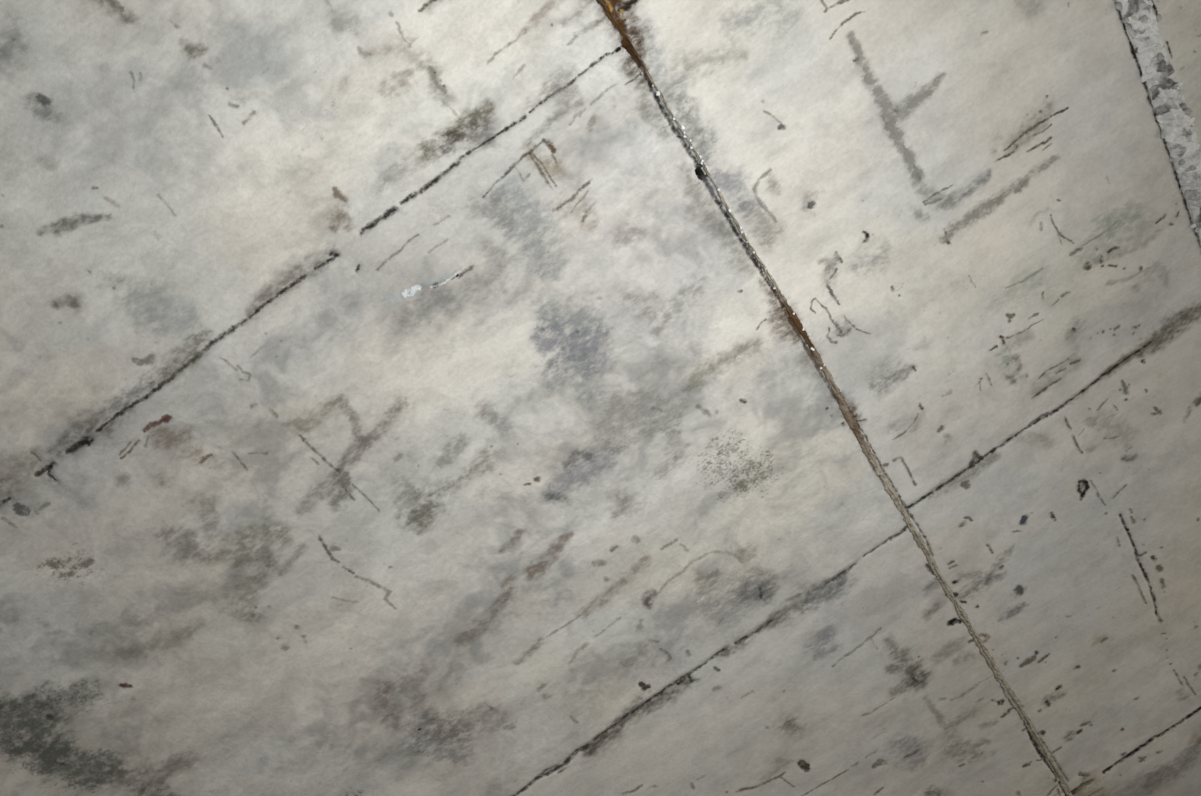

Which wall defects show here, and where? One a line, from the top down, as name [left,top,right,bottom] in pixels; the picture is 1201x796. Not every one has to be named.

corrosion [602,0,642,46]
leakage [0,693,180,790]